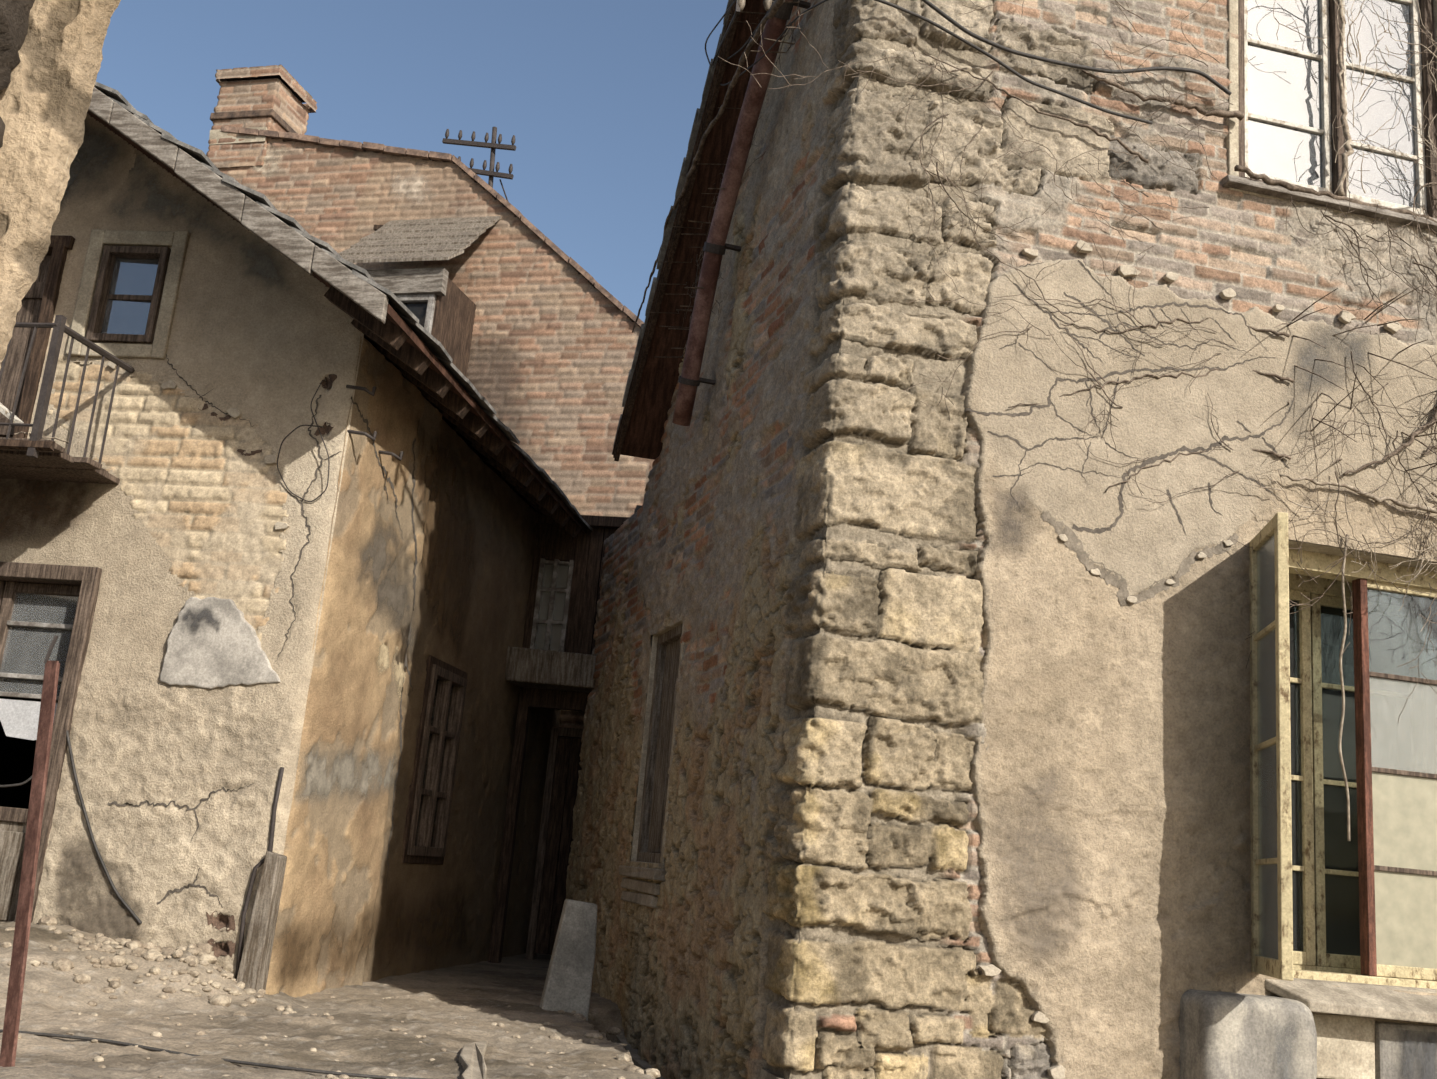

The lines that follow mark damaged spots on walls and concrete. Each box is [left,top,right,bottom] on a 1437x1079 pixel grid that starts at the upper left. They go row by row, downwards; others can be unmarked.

flaking render [1018,23,1437,347]
flaking render [47,355,290,641]
flaking render [314,421,333,436]
flaking render [319,374,337,390]
crack [275,395,418,889]
water stain [361,435,474,657]
crack [108,783,254,908]
flaking render [943,963,1066,1079]